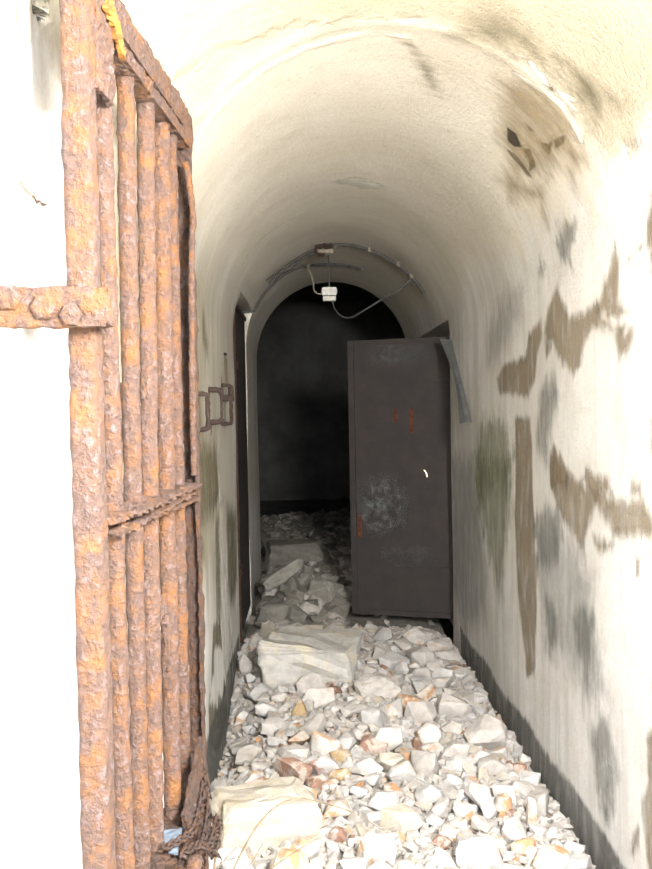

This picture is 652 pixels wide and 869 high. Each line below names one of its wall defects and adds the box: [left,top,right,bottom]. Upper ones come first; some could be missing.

hole [32,2,49,20]
peeling [513,61,583,143]
crack [20,181,49,206]
flaking render [507,128,535,177]
leakage [557,225,573,263]
leakage [639,207,652,256]
leakage [498,251,622,396]
leakage [616,327,633,355]
leakage [479,381,652,676]
leakage [199,425,240,784]
leakage [461,631,623,869]
leakage [632,732,652,869]